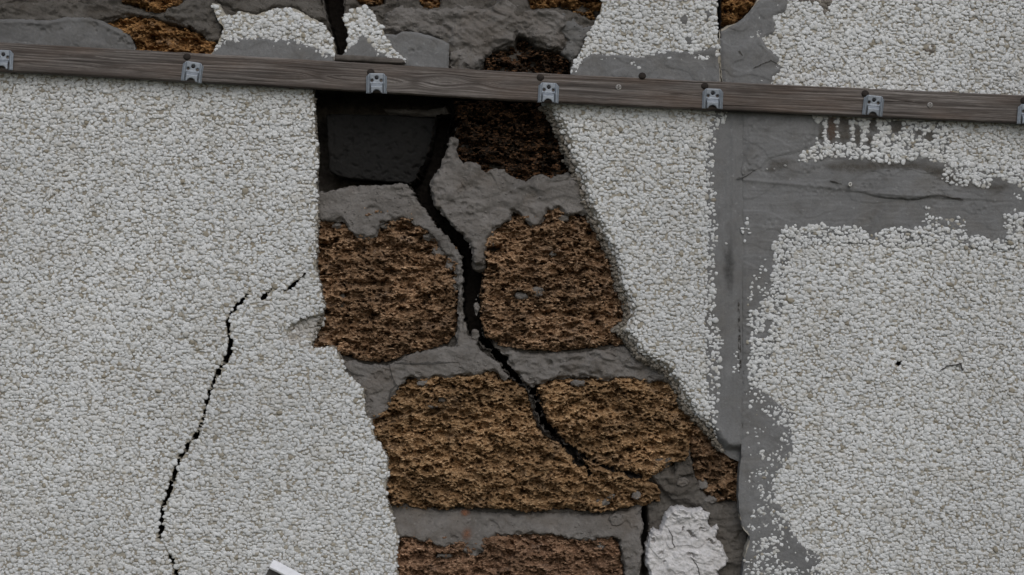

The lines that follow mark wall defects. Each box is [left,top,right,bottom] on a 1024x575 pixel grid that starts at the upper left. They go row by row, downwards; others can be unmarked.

spalling [0,0,788,84]
crack [159,272,306,575]
crack [389,361,458,403]
crack [408,113,642,479]
spalling [283,90,1024,575]